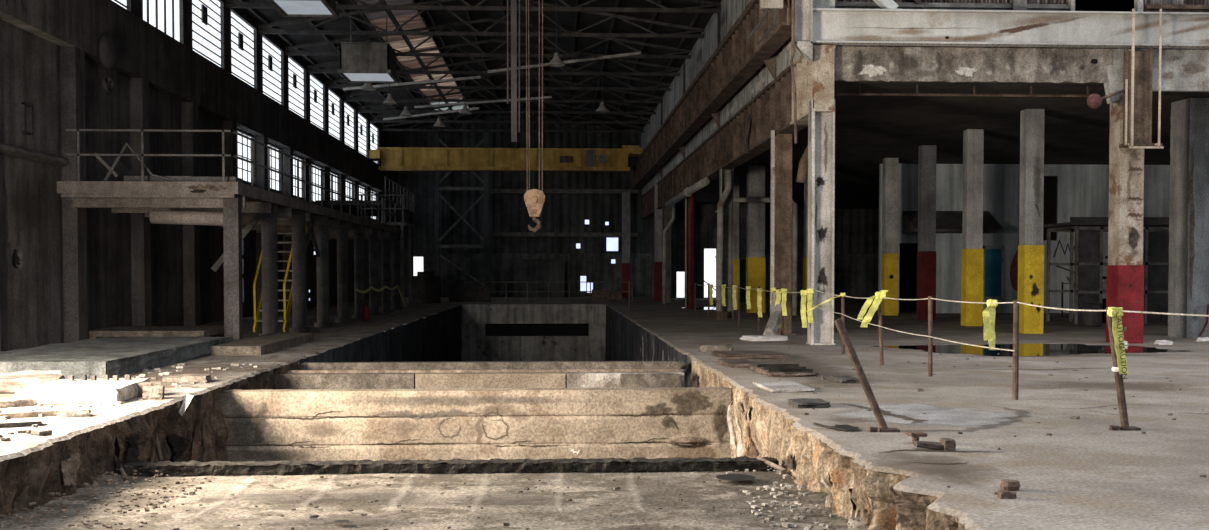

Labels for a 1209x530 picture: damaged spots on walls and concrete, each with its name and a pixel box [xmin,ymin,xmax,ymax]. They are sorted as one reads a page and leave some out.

corrosion [902,17,1073,73]
spalling [0,305,462,517]
spalling [605,305,966,530]